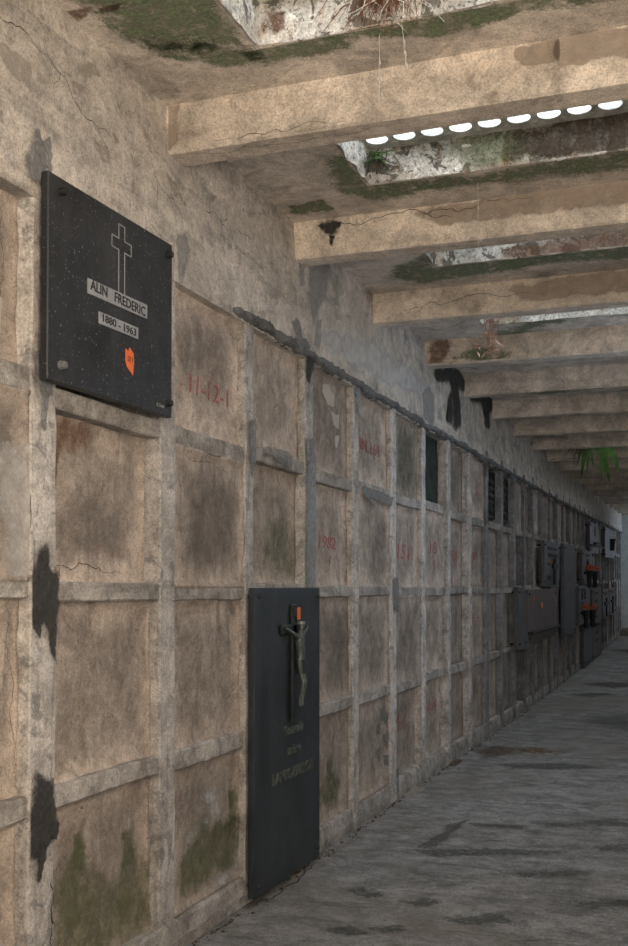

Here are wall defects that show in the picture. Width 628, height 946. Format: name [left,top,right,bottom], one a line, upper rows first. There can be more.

leakage [144,39,263,67]
leakage [514,28,628,66]
leakage [416,181,628,225]
leakage [511,271,628,300]
peeling [33,610,42,638]